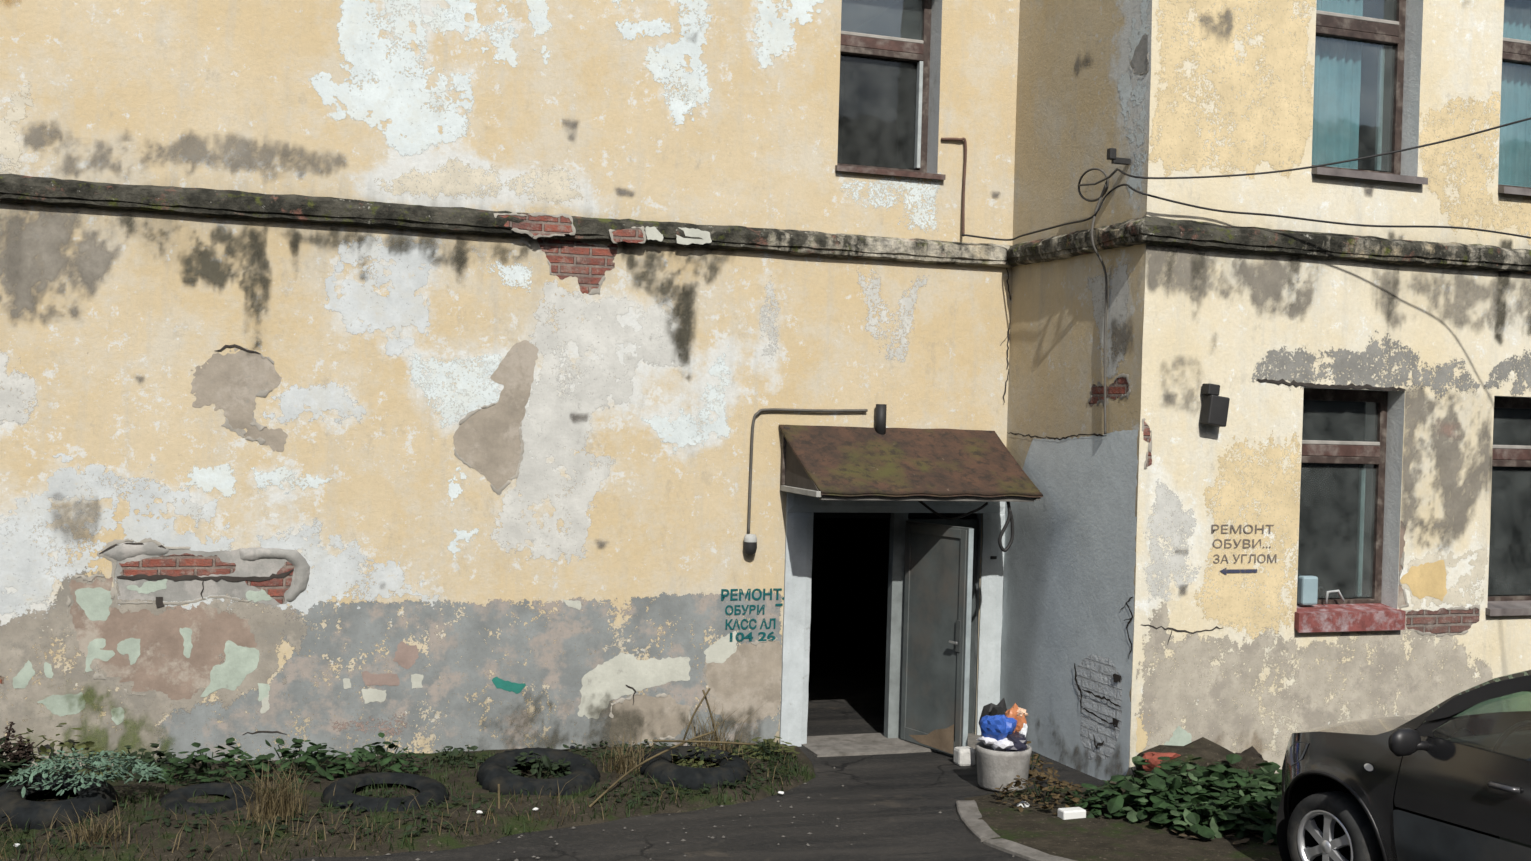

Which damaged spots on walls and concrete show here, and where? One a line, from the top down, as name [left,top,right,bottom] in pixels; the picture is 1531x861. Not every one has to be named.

leakage [0,206,133,321]
leakage [183,227,270,316]
leakage [147,135,345,176]
peeling [308,0,731,564]
peeling [840,172,941,231]
crack [1000,268,1107,440]
peeling [1086,263,1131,407]
peeling [1117,0,1316,212]
leakage [1146,245,1313,318]
leakage [1381,271,1531,343]
peeling [0,344,440,770]
spalling [1074,418,1504,776]